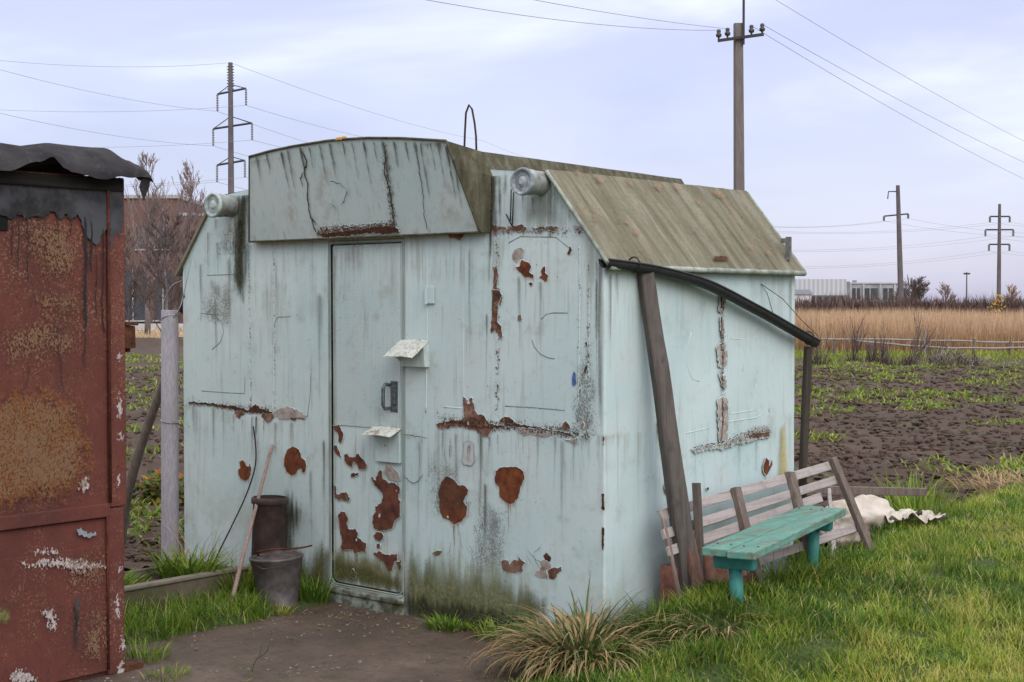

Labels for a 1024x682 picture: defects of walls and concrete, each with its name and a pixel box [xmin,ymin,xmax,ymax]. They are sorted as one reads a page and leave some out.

crack [300,154,347,236]
leakage [281,142,459,192]
leakage [228,195,248,296]
corrosion [490,265,503,342]
corrosion [516,260,548,287]
peeling [692,296,772,455]
corrosion [436,396,585,437]
corrosion [284,446,307,476]
corrosion [333,424,402,572]
corrosion [438,476,469,525]
corrosion [494,466,525,511]
peeling [22,547,126,674]